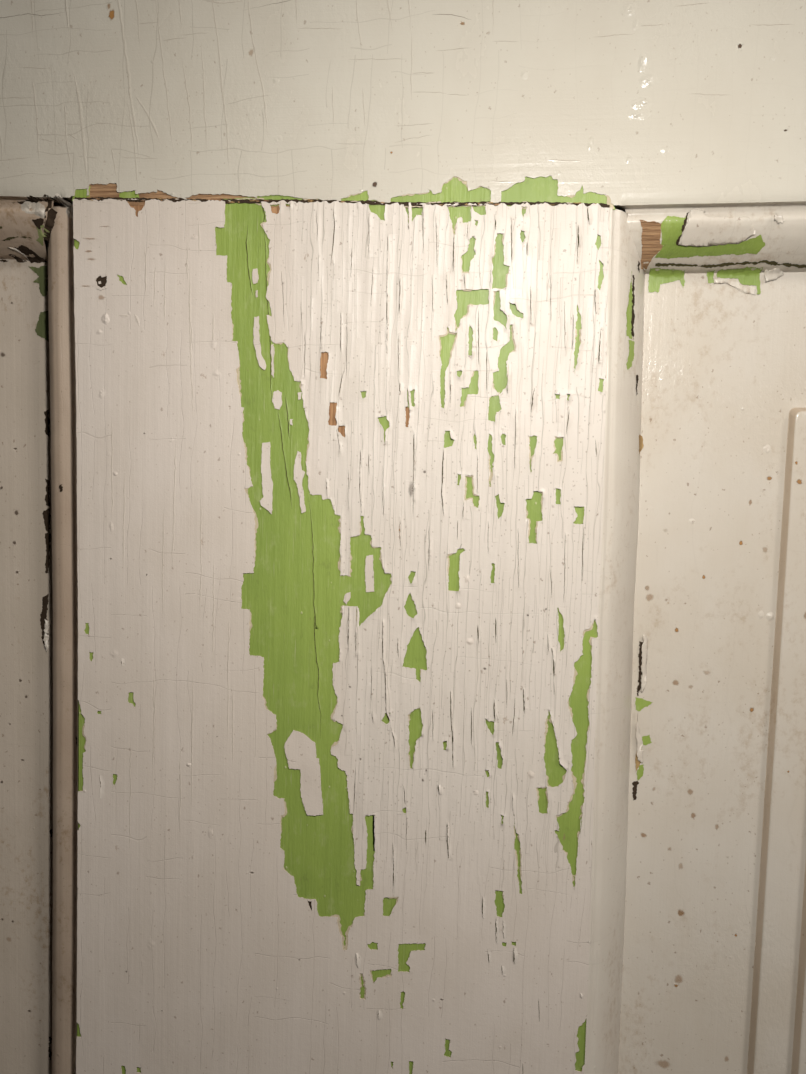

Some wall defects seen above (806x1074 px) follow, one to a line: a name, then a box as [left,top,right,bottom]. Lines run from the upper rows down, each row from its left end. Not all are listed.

peeling [341,176,616,273]
peeling [439,233,523,422]
peeling [626,209,765,370]
crack [0,181,610,725]
peeling [72,183,392,950]
crack [348,608,401,749]
crack [354,770,451,894]
peeling [402,571,427,682]
crack [432,679,529,795]
peeling [536,620,598,887]
crack [631,781,639,800]
crack [636,642,644,696]